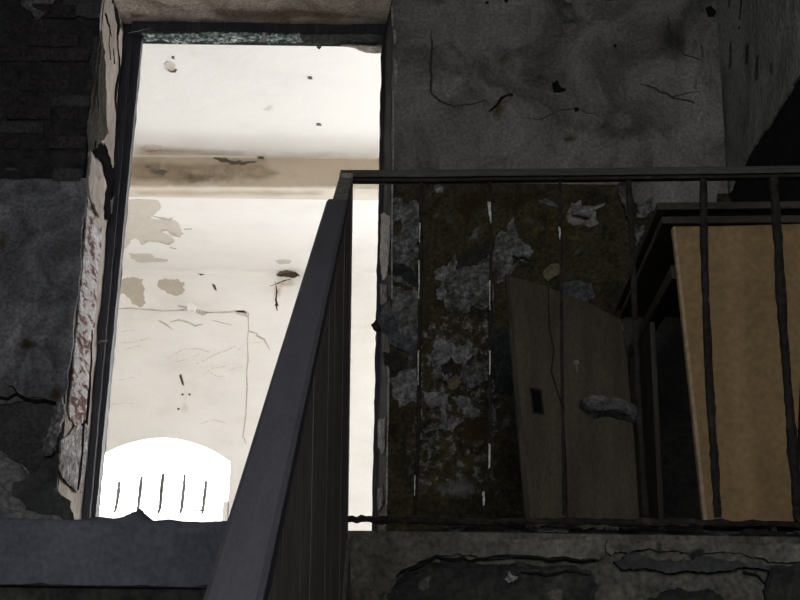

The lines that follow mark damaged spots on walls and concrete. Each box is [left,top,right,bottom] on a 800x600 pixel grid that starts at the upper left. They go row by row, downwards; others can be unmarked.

crack [429,31,510,112]
crack [641,84,700,103]
water stain [135,164,275,181]
flaking render [0,0,115,493]
peeling [124,199,192,263]
peeling [120,277,146,307]
peeling [157,278,185,296]
crack [0,385,57,405]
crack [119,305,270,444]
flaking render [371,184,606,512]
flaking render [350,534,800,600]